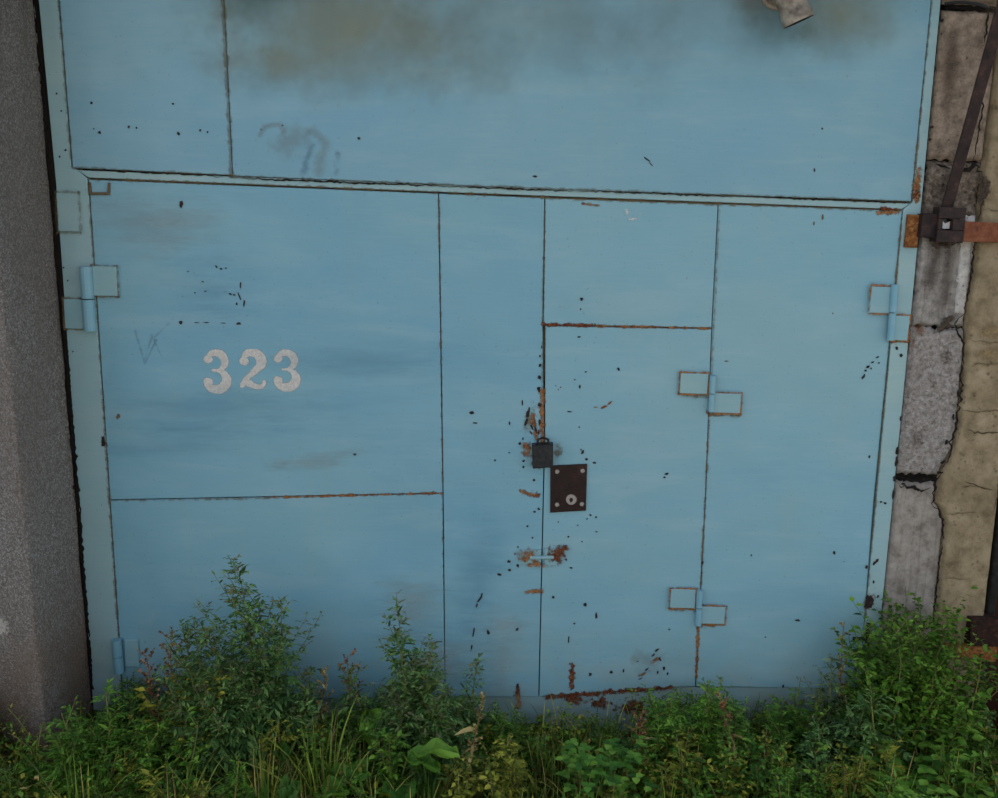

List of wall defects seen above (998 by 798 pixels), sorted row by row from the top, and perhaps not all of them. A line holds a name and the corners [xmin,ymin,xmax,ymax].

corrosion [912,167,921,203]
crack [936,102,998,218]
corrosion [522,413,540,469]
crack [899,245,998,619]
corrosion [517,545,569,567]
corrosion [591,694,648,716]